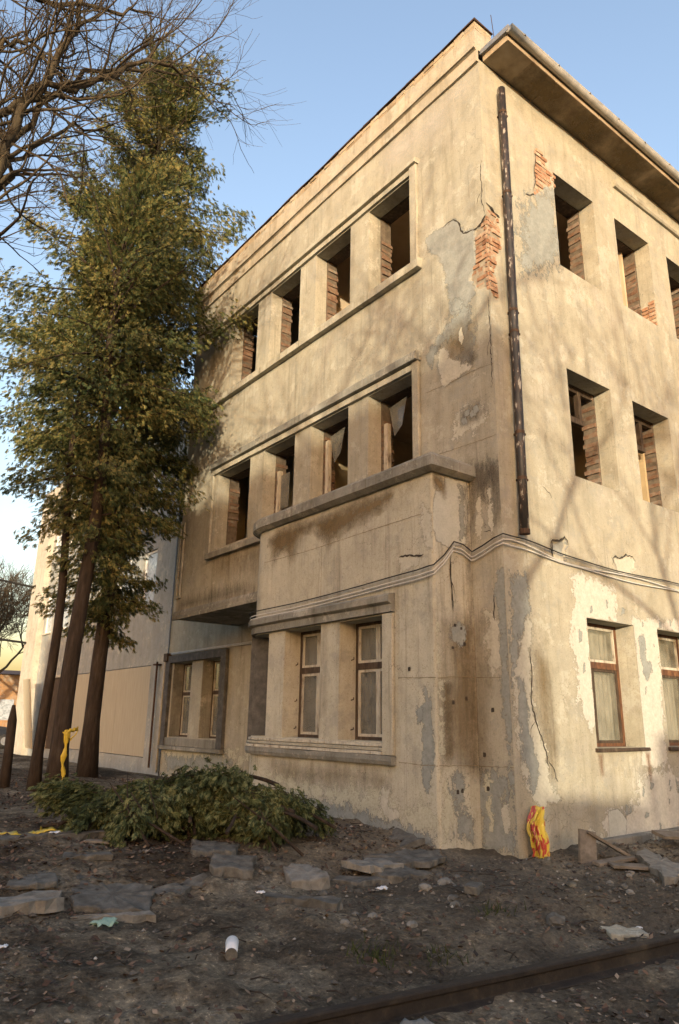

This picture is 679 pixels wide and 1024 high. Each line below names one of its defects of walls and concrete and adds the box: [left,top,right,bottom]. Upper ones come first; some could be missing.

flaking render [526,148,556,196]
peeling [425,204,502,387]
flaking render [642,300,657,325]
peeling [162,567,560,856]
crack [530,649,558,781]
peeling [569,554,679,838]